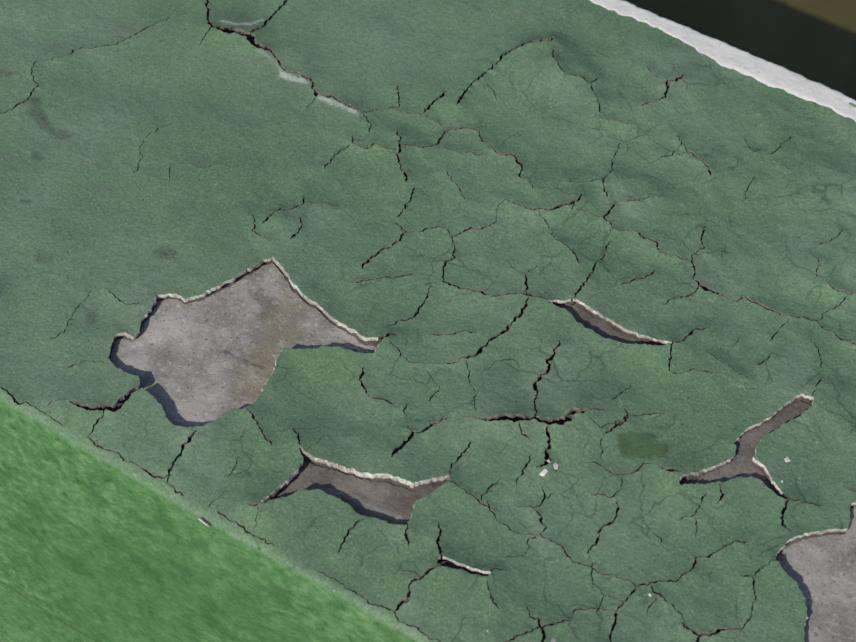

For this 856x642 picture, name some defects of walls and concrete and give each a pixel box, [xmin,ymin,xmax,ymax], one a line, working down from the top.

crack [0,0,856,496]
peeling [108,257,385,438]
peeling [548,298,672,345]
crack [210,456,274,545]
peeling [259,445,450,534]
crack [317,522,443,642]
crack [448,441,774,642]
peeling [679,394,814,503]
crack [780,493,821,533]
peeling [774,503,856,642]